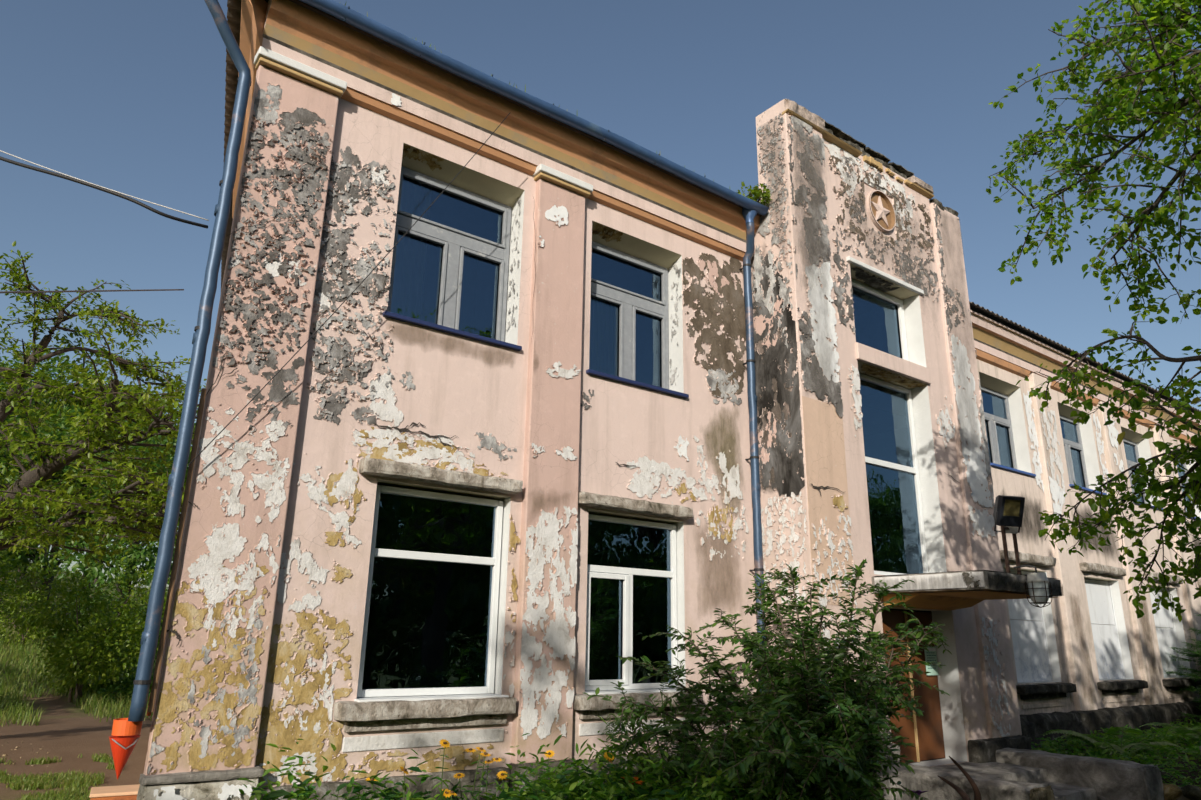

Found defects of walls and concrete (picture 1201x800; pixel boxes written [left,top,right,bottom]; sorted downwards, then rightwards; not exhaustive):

peeling [506,197,521,331]
peeling [545,205,569,226]
peeling [147,82,517,800]
crack [374,422,459,448]
peeling [531,443,577,460]
peeling [546,361,581,379]
peeling [580,389,594,409]
water stain [756,329,792,487]
peeling [626,112,999,649]
peeling [503,506,578,740]